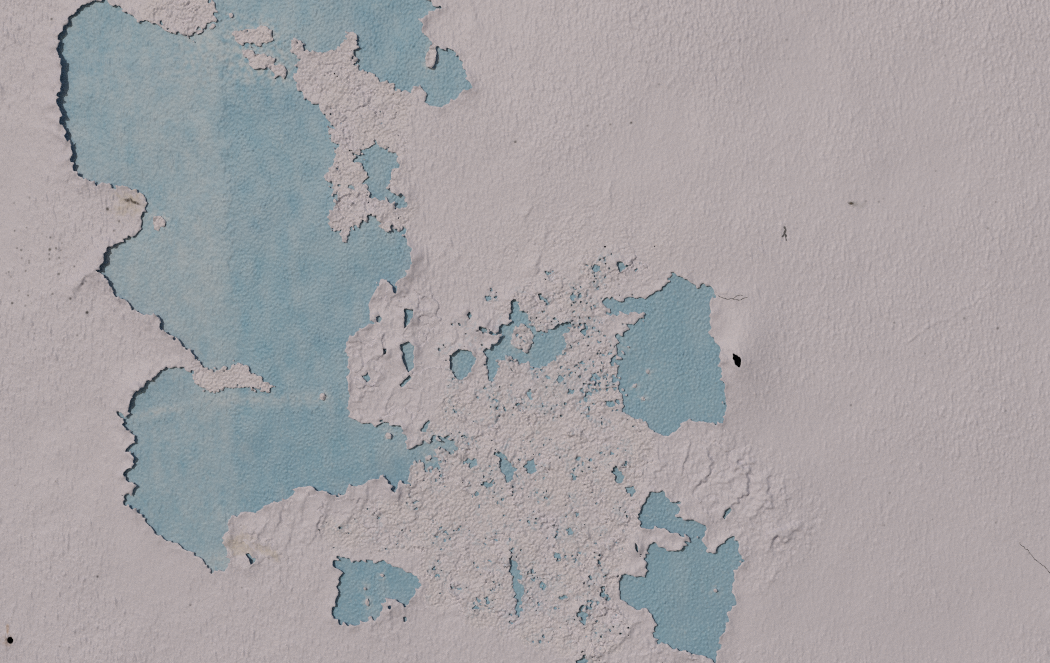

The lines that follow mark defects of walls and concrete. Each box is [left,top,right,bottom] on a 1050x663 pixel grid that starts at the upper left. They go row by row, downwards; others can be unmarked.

peeling [44,0,756,663]